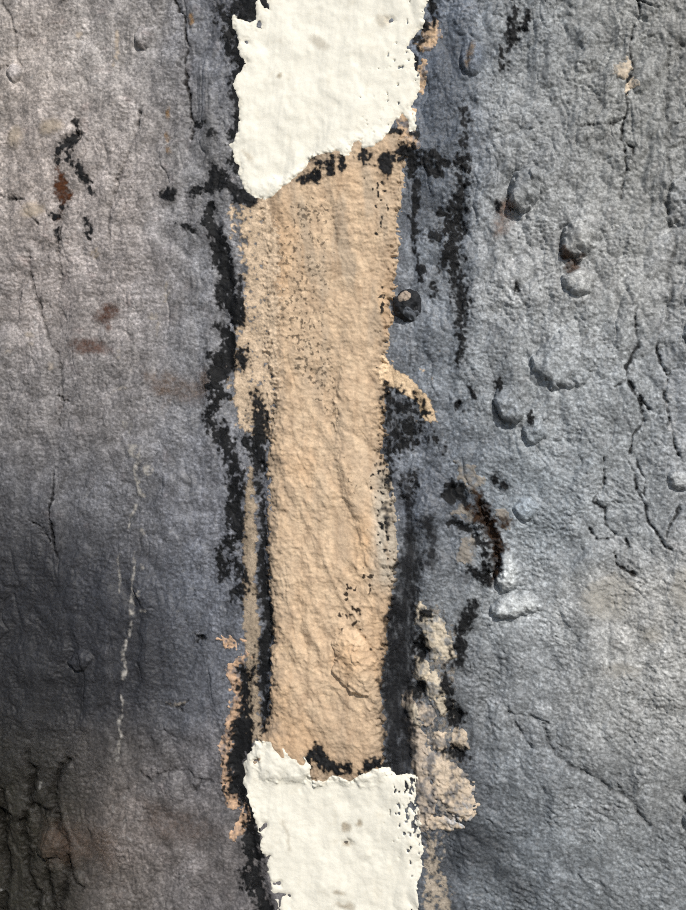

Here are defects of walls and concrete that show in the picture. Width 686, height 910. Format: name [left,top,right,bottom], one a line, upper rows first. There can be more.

corrosion [54,167,73,205]
damp [55,118,95,195]
damp [159,187,177,201]
crack [174,0,194,140]
spalling [415,19,443,95]
damp [175,0,275,910]
flaking render [257,107,421,782]
damp [304,380,494,790]
crack [589,458,606,539]
crack [618,324,680,550]
spalling [215,635,253,842]
spalling [401,601,480,833]